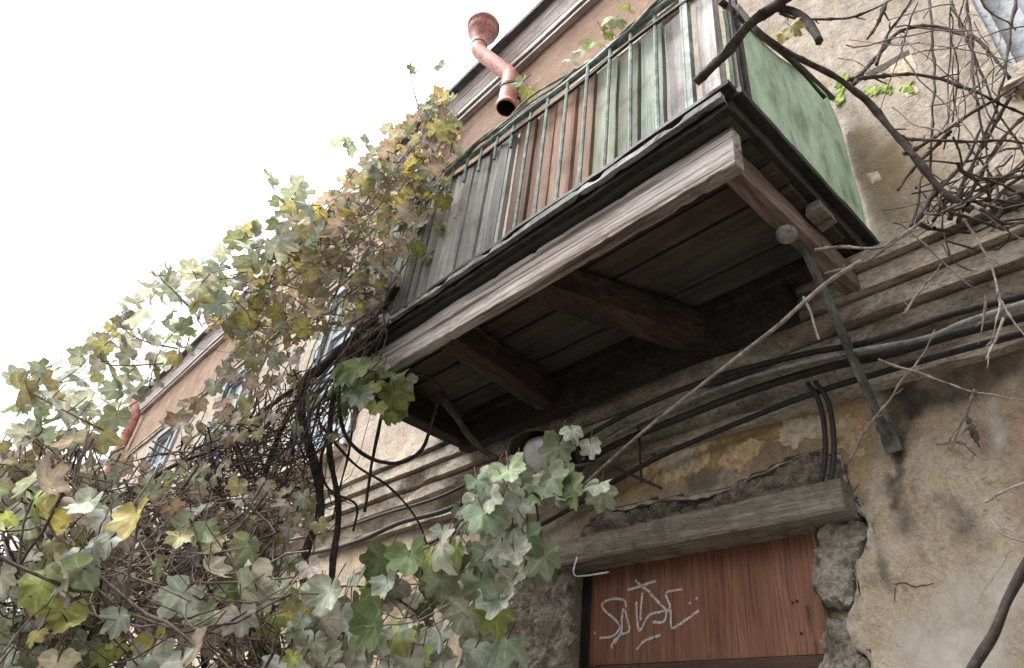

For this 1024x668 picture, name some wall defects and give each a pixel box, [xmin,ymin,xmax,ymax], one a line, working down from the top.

spalling [579,401,871,537]
leakage [883,365,1015,440]
spalling [505,569,578,668]
spalling [790,498,874,668]